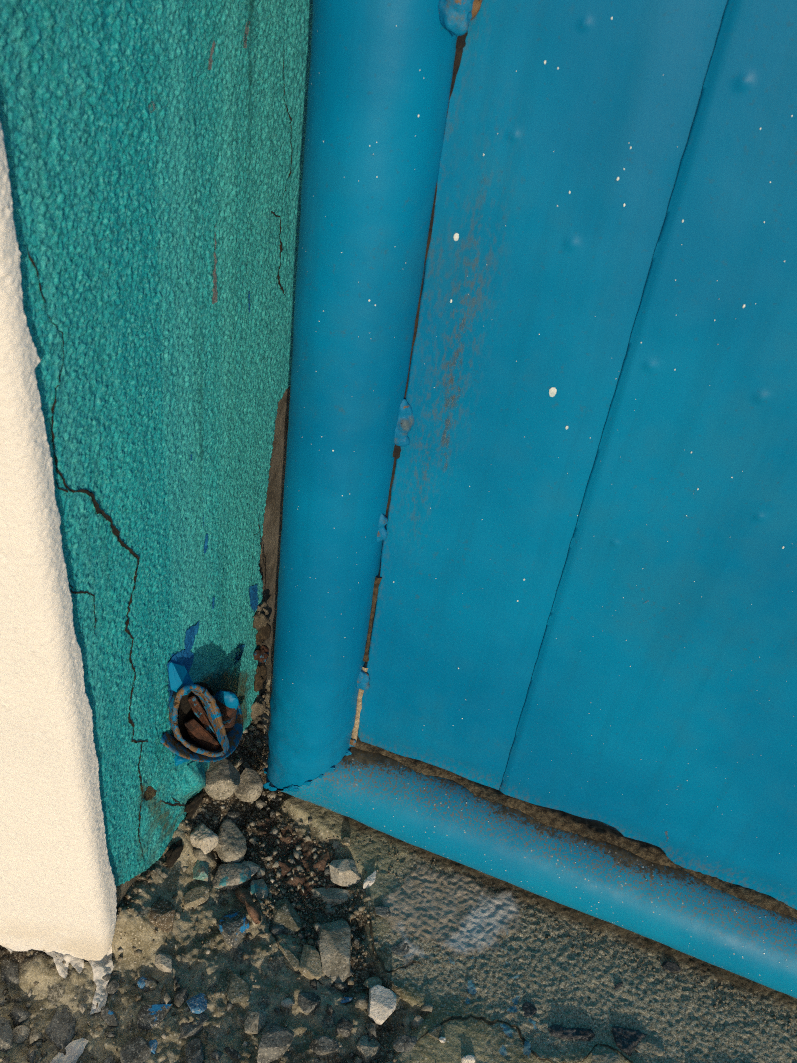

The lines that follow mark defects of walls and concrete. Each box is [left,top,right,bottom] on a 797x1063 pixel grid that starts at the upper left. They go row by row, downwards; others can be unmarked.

crack [27,248,185,868]
spalling [251,601,271,739]
spalling [143,786,157,801]
spalling [184,792,204,819]
spalling [165,839,183,868]
crack [417,1015,633,1063]